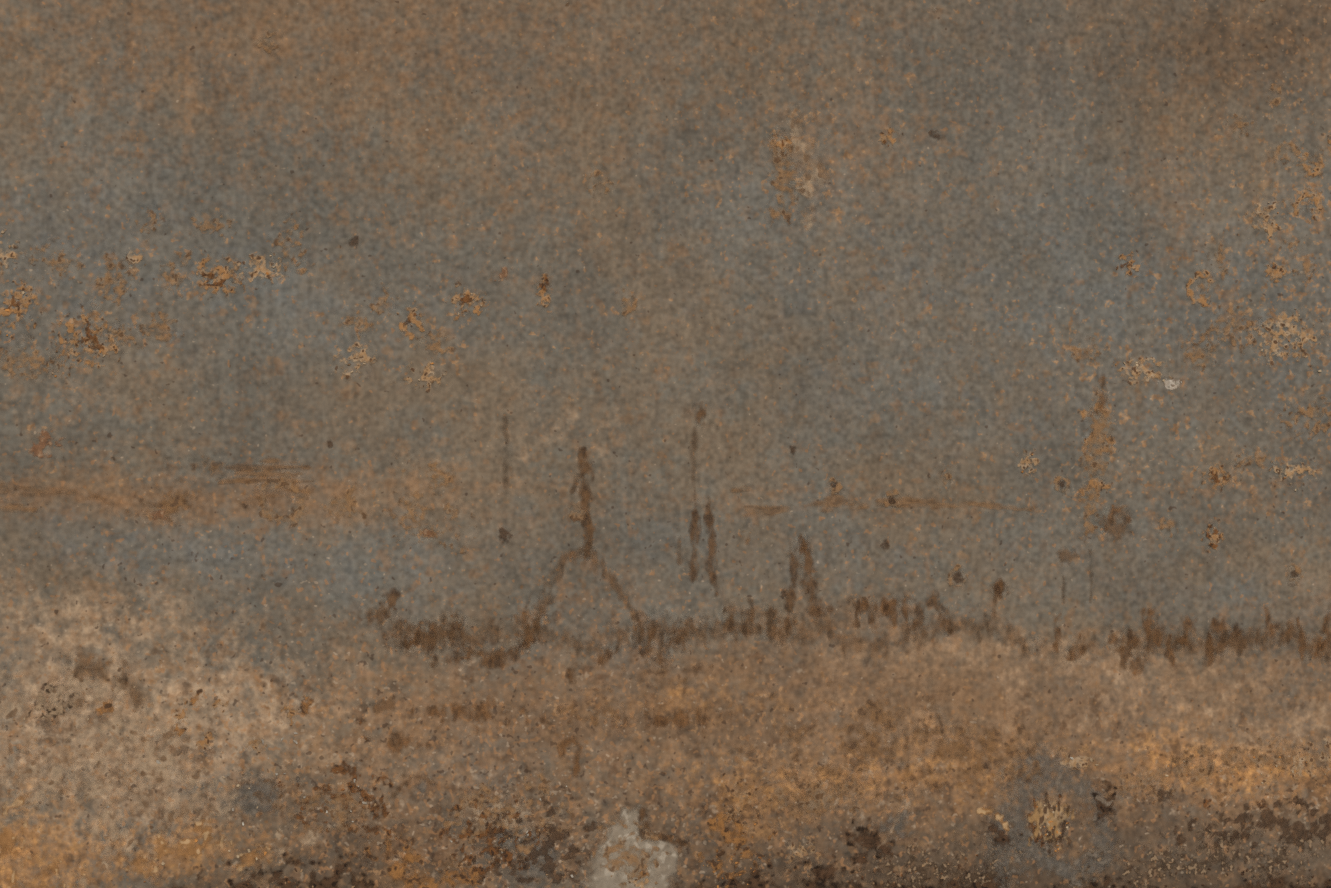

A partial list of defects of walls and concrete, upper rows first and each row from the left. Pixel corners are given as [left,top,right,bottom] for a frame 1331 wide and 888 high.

rust [0,231,82,338]
rust [2,305,177,378]
rust [163,221,307,295]
rust [334,289,453,392]
rust [1185,244,1322,372]
rust [1246,139,1331,282]
leakage [569,448,593,544]
rust [1202,455,1317,491]
leakage [691,506,716,583]
leakage [785,539,820,632]
leakage [1109,612,1192,674]
rust [127,739,598,888]